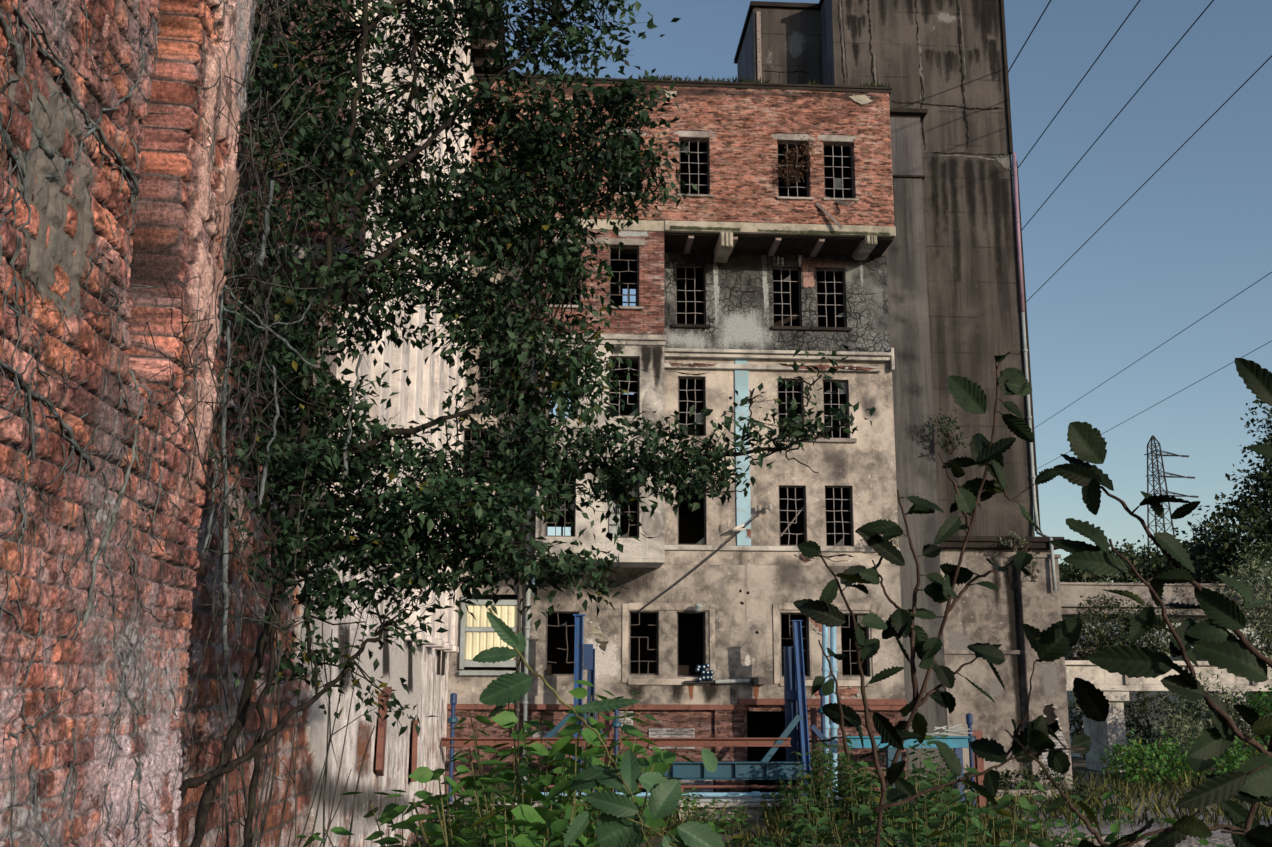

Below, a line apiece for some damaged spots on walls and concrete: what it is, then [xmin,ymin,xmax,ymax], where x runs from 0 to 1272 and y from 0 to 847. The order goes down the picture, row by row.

water stain [846,0,865,65]
crack [838,0,1005,161]
water stain [907,0,956,29]
water stain [926,0,1001,84]
water stain [931,157,1008,276]